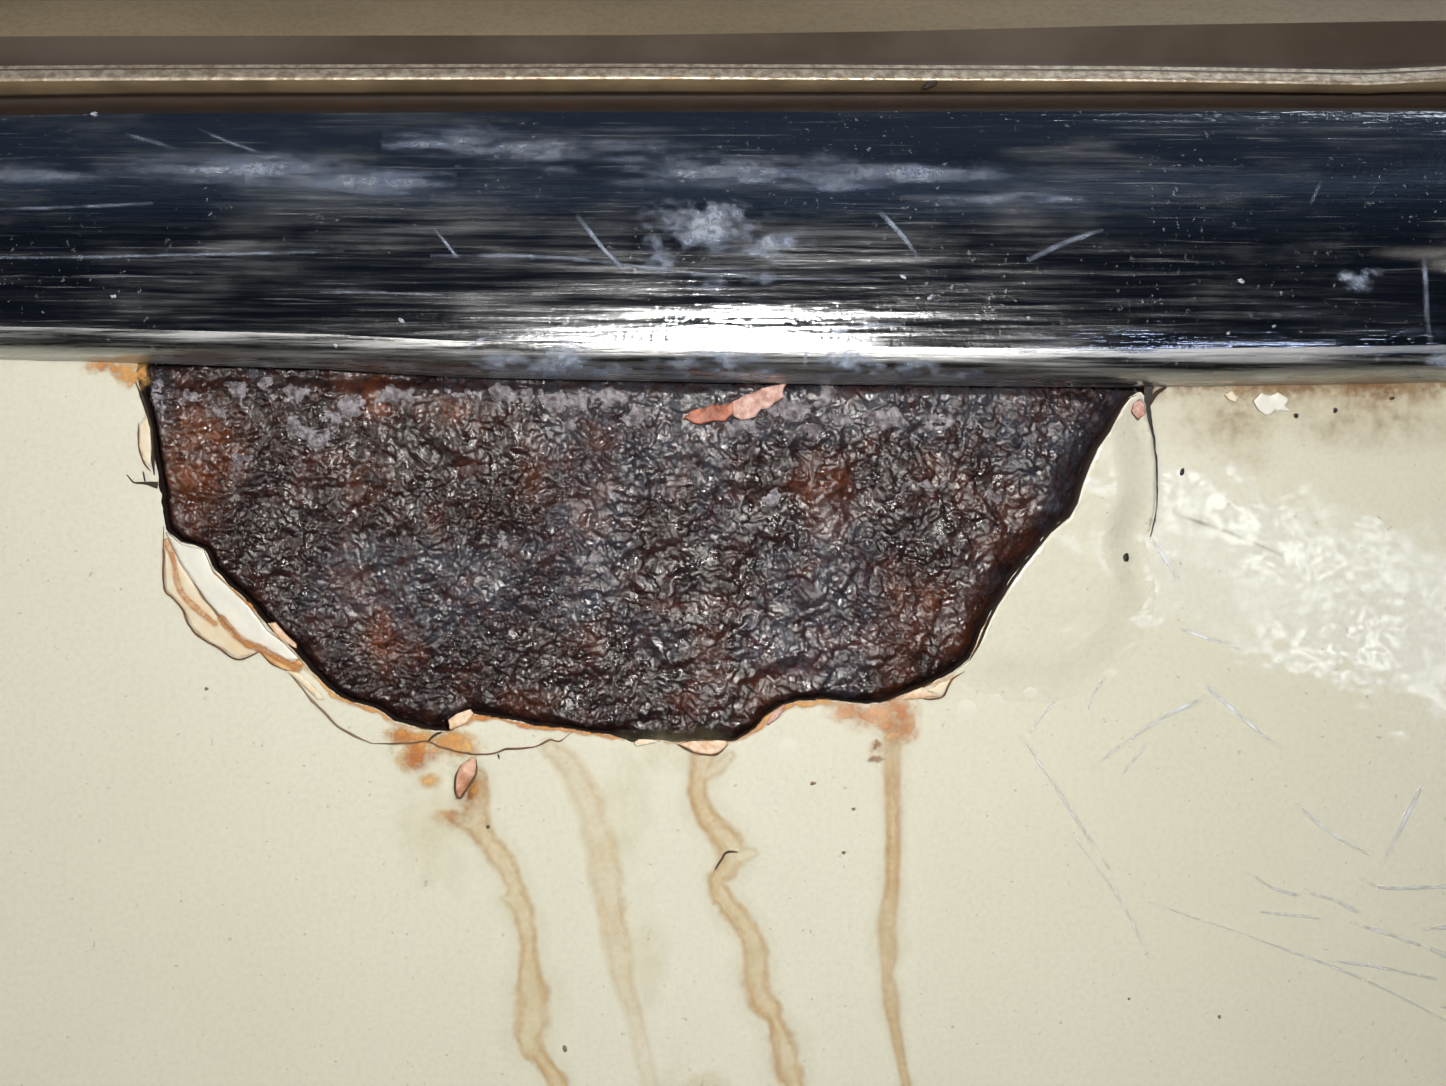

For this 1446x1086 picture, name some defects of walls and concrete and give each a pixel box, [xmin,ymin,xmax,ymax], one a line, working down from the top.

peeling [135,363,1146,756]
corrosion [314,676,624,785]
corrosion [743,700,914,763]